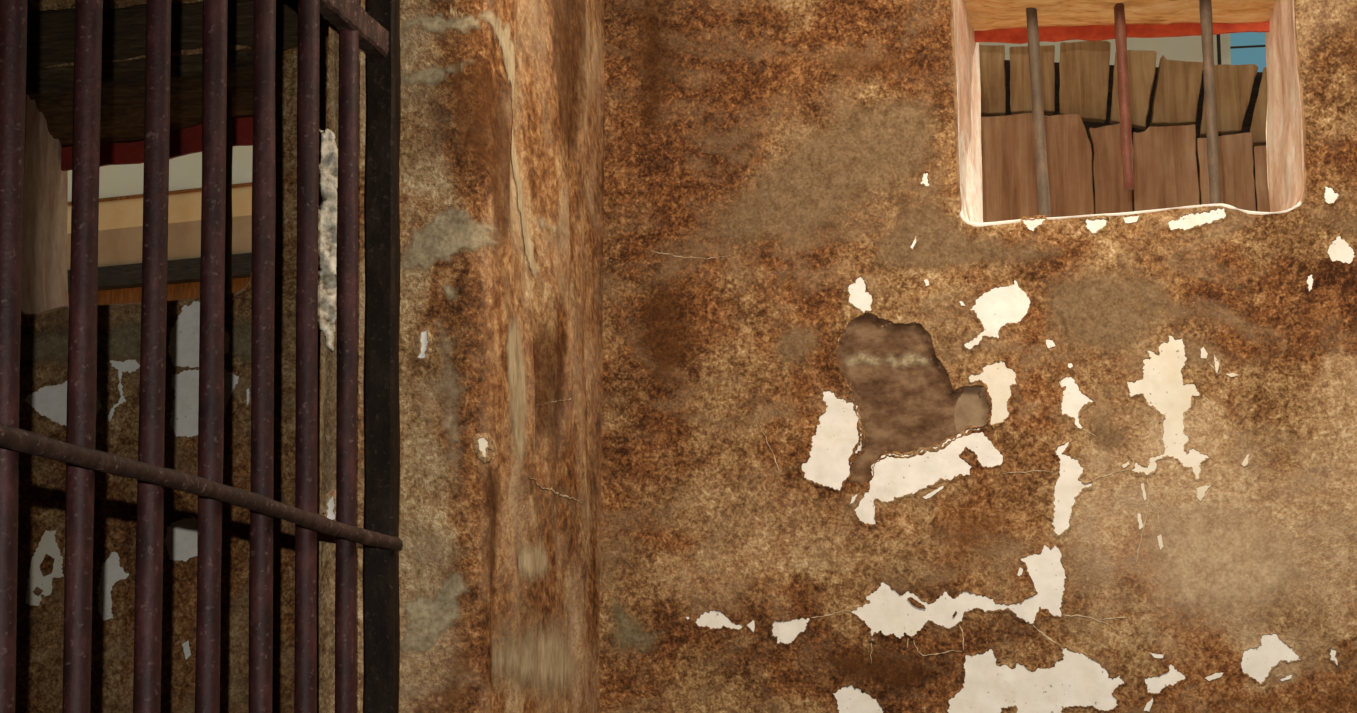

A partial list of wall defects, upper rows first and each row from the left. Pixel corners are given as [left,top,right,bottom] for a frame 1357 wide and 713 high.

peeling [1320,185,1343,207]
peeling [23,377,67,431]
peeling [96,357,140,426]
peeling [166,299,200,441]
spalling [798,273,1035,529]
peeling [1122,333,1237,529]
peeling [849,363,1097,644]
peeling [23,527,65,610]
peeling [94,548,132,622]
peeling [686,605,812,647]
peeling [945,645,1189,713]
peeling [1237,631,1302,687]